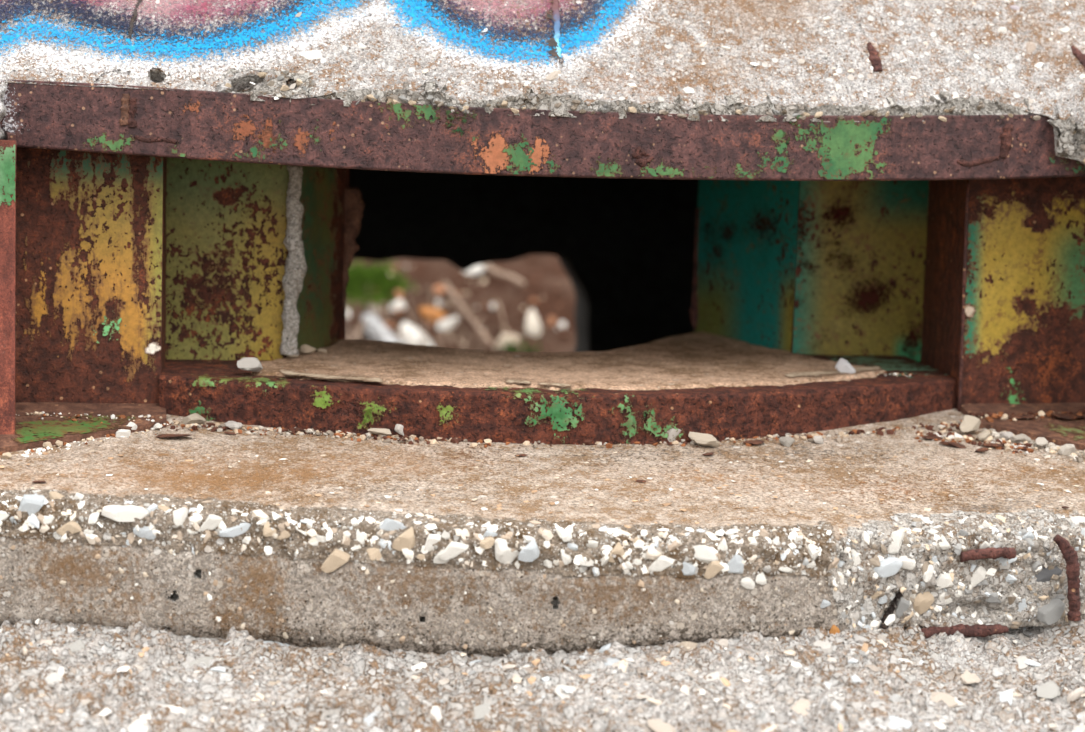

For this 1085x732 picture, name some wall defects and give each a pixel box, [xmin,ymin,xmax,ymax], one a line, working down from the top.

spalling [147,60,169,85]
spalling [550,0,562,68]
spalling [1028,14,1085,79]
peeling [213,29,1085,404]
peeling [16,114,347,383]
peeling [12,413,136,476]
peeling [310,383,342,410]
peeling [357,397,396,430]
peeling [436,403,459,427]
peeling [485,386,595,444]
spalling [0,448,1085,639]